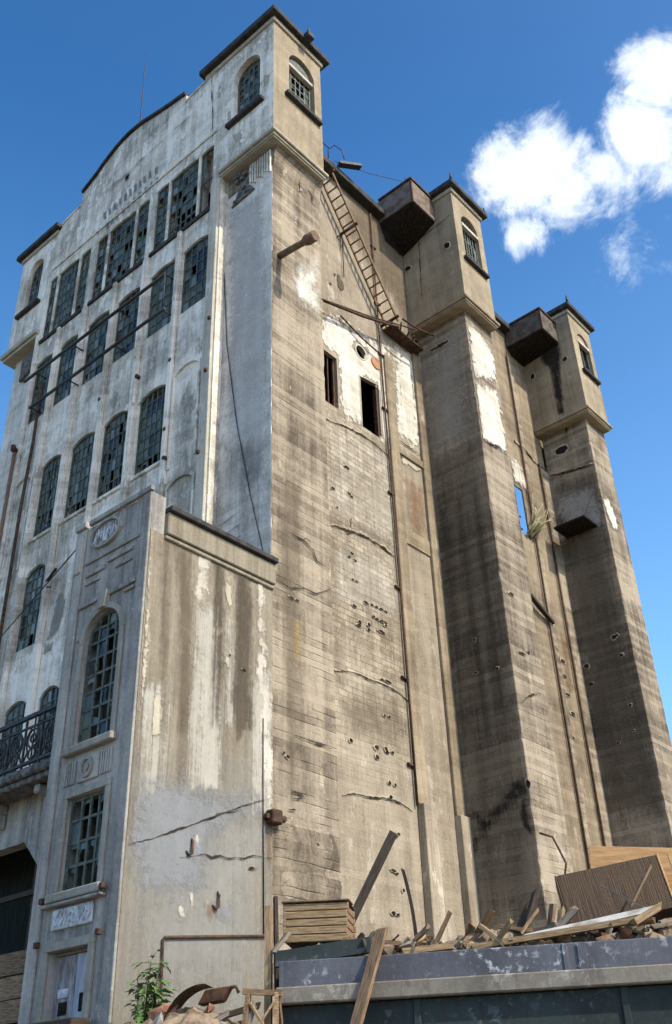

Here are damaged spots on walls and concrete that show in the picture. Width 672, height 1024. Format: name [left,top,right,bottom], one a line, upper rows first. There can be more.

peeling [294,264,422,539]
peeling [468,325,528,491]
crack [276,532,330,595]
crack [330,519,394,556]
peeling [335,542,398,634]
water stain [119,550,271,1024]
crack [130,791,305,844]
crack [342,790,413,812]
water stain [475,781,531,840]
crack [181,854,295,870]